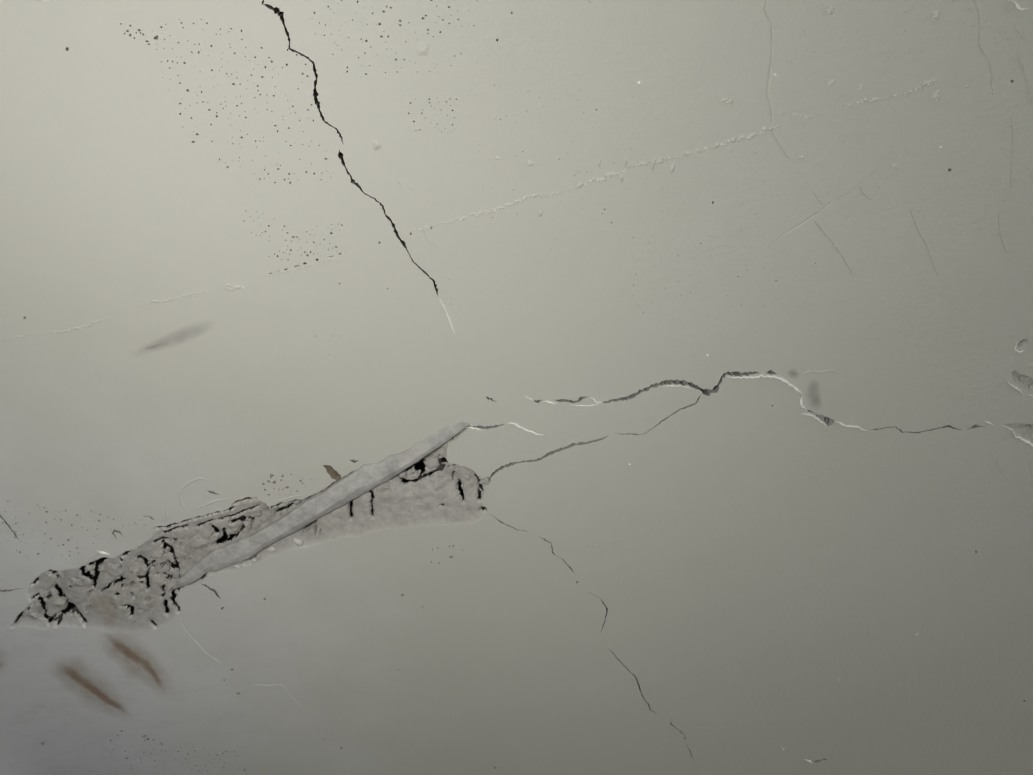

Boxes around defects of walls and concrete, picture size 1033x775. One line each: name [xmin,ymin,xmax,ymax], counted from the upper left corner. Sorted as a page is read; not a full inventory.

crack [262,0,455,334]
crack [466,370,993,481]
flaking render [10,422,494,635]
crack [490,514,574,573]
crack [590,593,694,760]